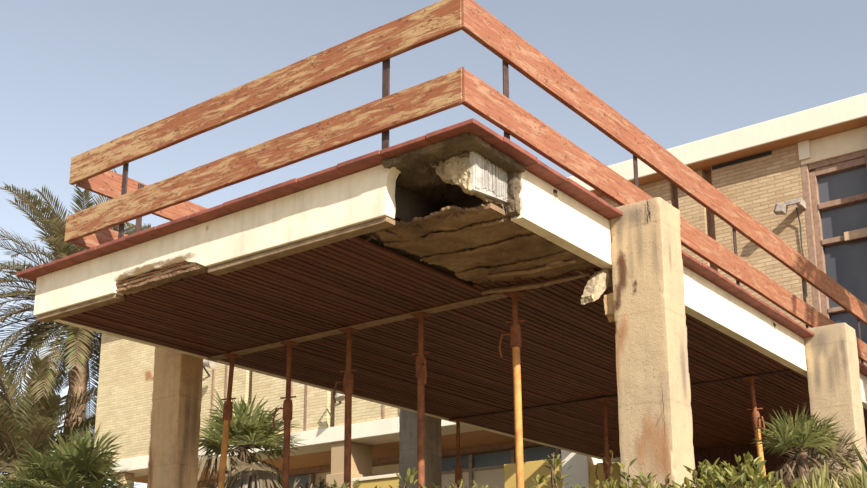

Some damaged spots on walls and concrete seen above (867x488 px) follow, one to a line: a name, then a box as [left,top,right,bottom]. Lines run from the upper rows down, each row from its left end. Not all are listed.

spalling [359,132,602,295]
spalling [116,262,209,295]
corrosion [614,253,637,309]